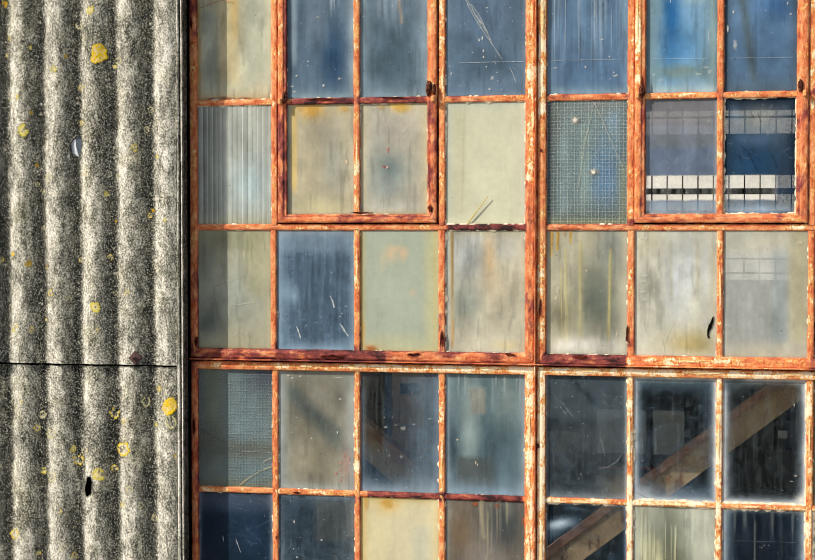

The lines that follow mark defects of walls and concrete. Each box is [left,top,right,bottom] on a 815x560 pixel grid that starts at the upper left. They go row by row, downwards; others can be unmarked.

peeling [530,2,544,33]